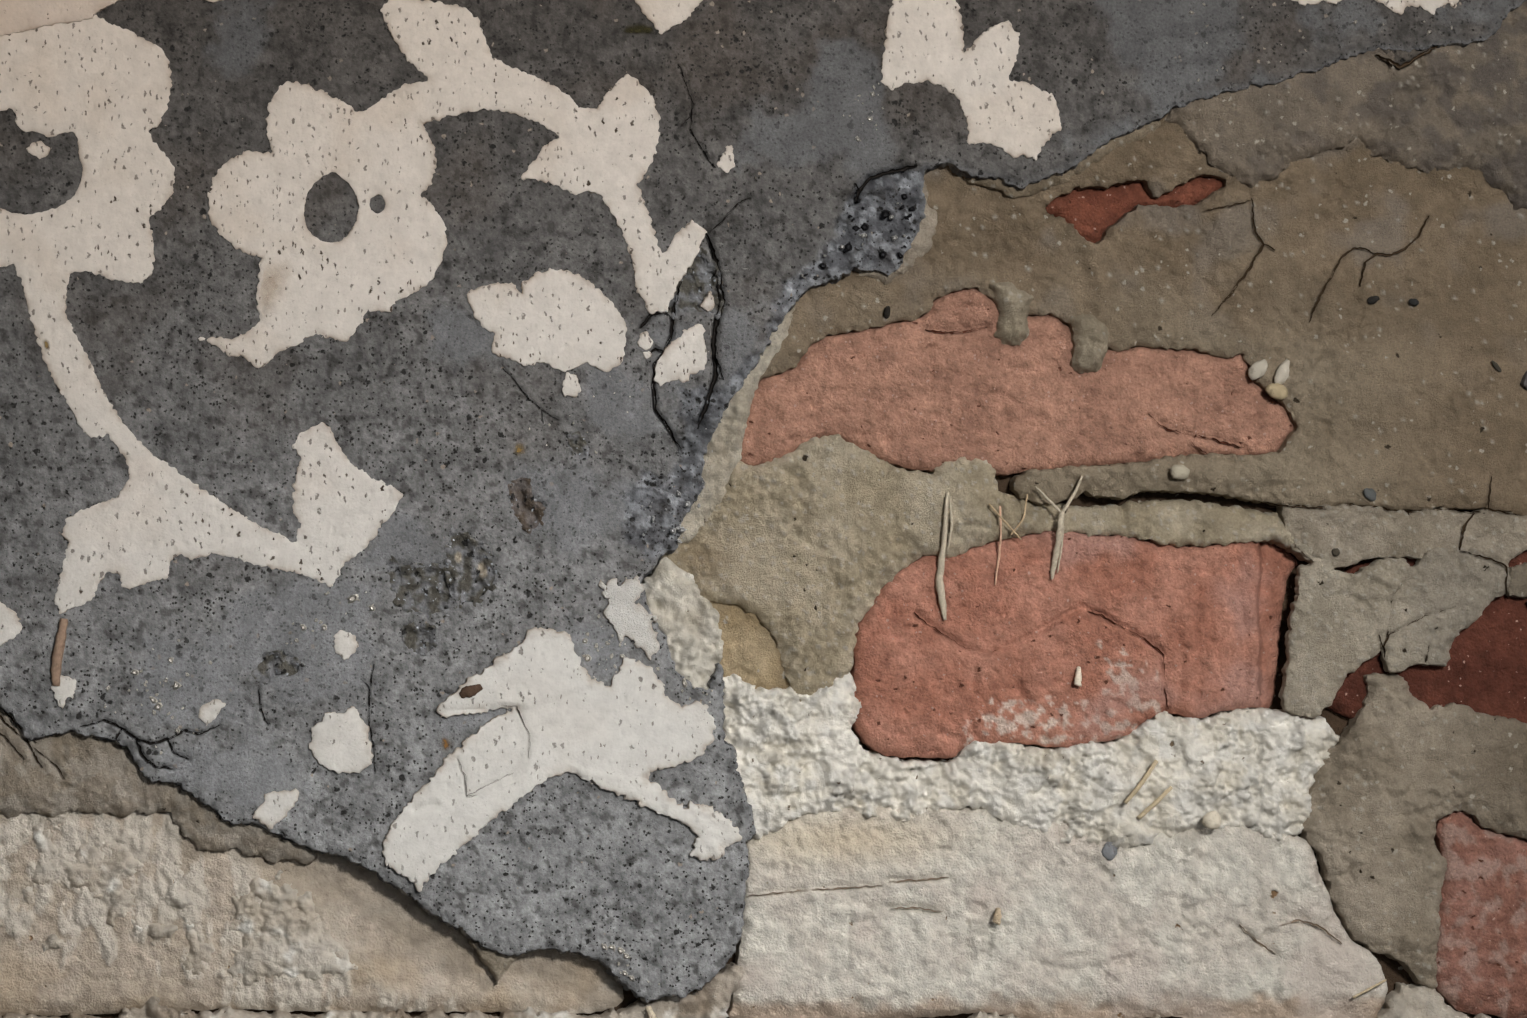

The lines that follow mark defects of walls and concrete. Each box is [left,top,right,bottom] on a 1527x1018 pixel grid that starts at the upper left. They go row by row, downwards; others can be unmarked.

crack [678,65,716,168]
crack [640,198,749,449]
flaking render [740,288,1293,476]
crack [1205,198,1275,316]
crack [1309,216,1429,322]
flaking render [850,531,1297,759]
flaking render [1327,594,1527,723]
crack [0,710,65,779]
crack [80,719,219,769]
peeling [309,706,374,774]
flaking render [0,809,660,1016]
flaking render [727,806,1388,1018]